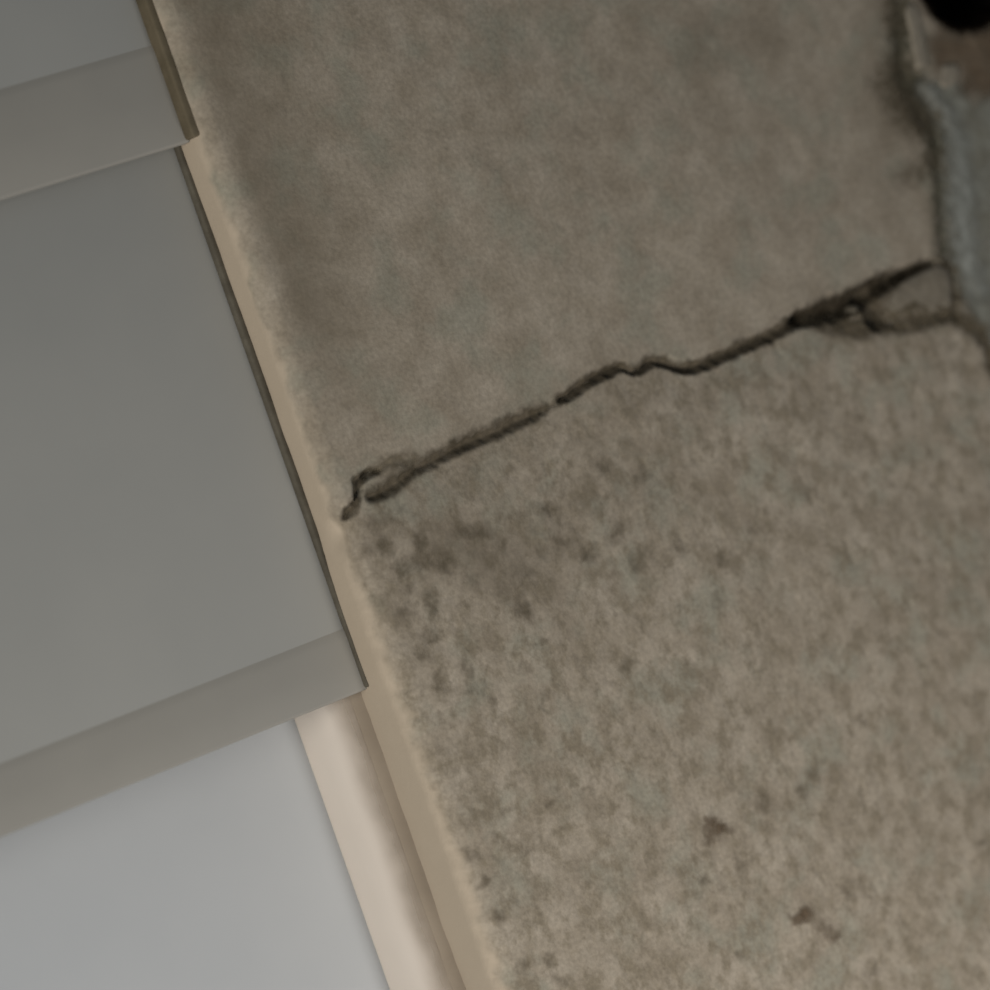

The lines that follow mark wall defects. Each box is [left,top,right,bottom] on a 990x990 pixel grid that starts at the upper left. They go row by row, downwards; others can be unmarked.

crack [342,0,990,520]